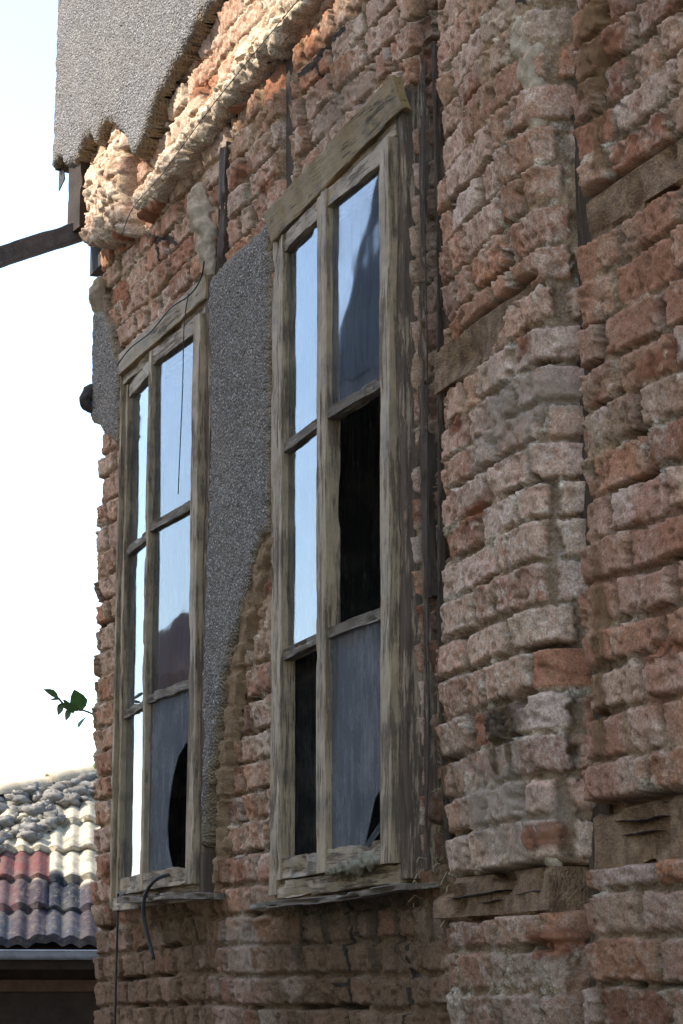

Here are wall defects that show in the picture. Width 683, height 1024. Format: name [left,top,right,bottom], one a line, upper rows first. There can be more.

spalling [189,79,209,101]
spalling [257,170,275,198]
flaking render [212,534,274,890]
crack [615,815,670,836]